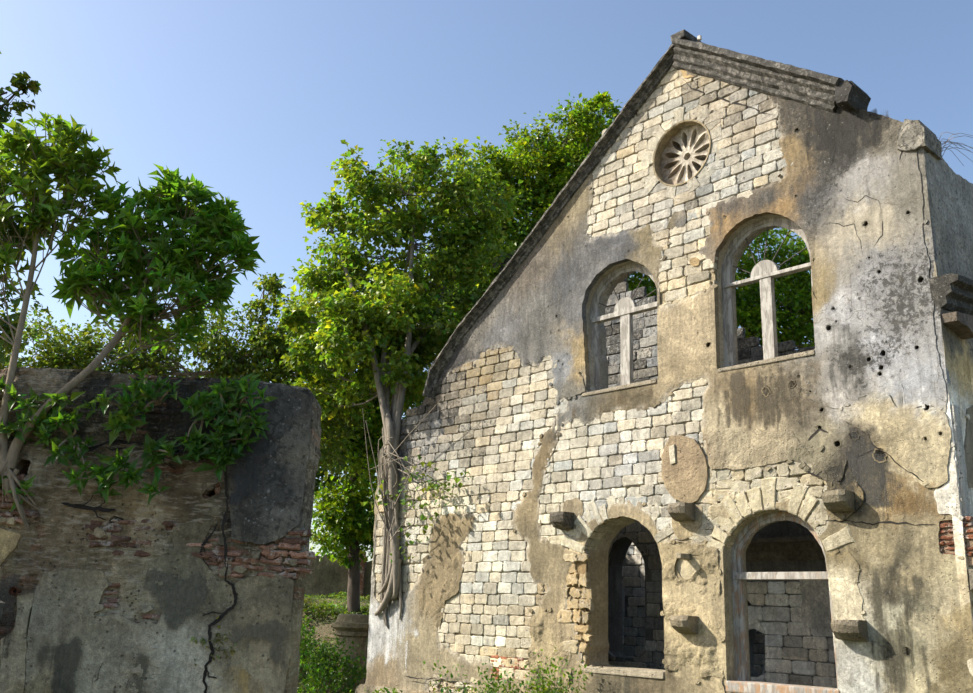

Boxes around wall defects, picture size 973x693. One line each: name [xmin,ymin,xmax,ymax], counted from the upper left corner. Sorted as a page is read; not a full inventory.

damp [806,109,889,164]
flaking render [586,66,793,307]
damp [718,368,800,429]
peeling [810,149,973,566]
crack [855,431,924,482]
crack [199,437,238,693]
flaking render [186,482,316,579]
flaking render [372,346,866,690]
flaking render [428,674,478,693]